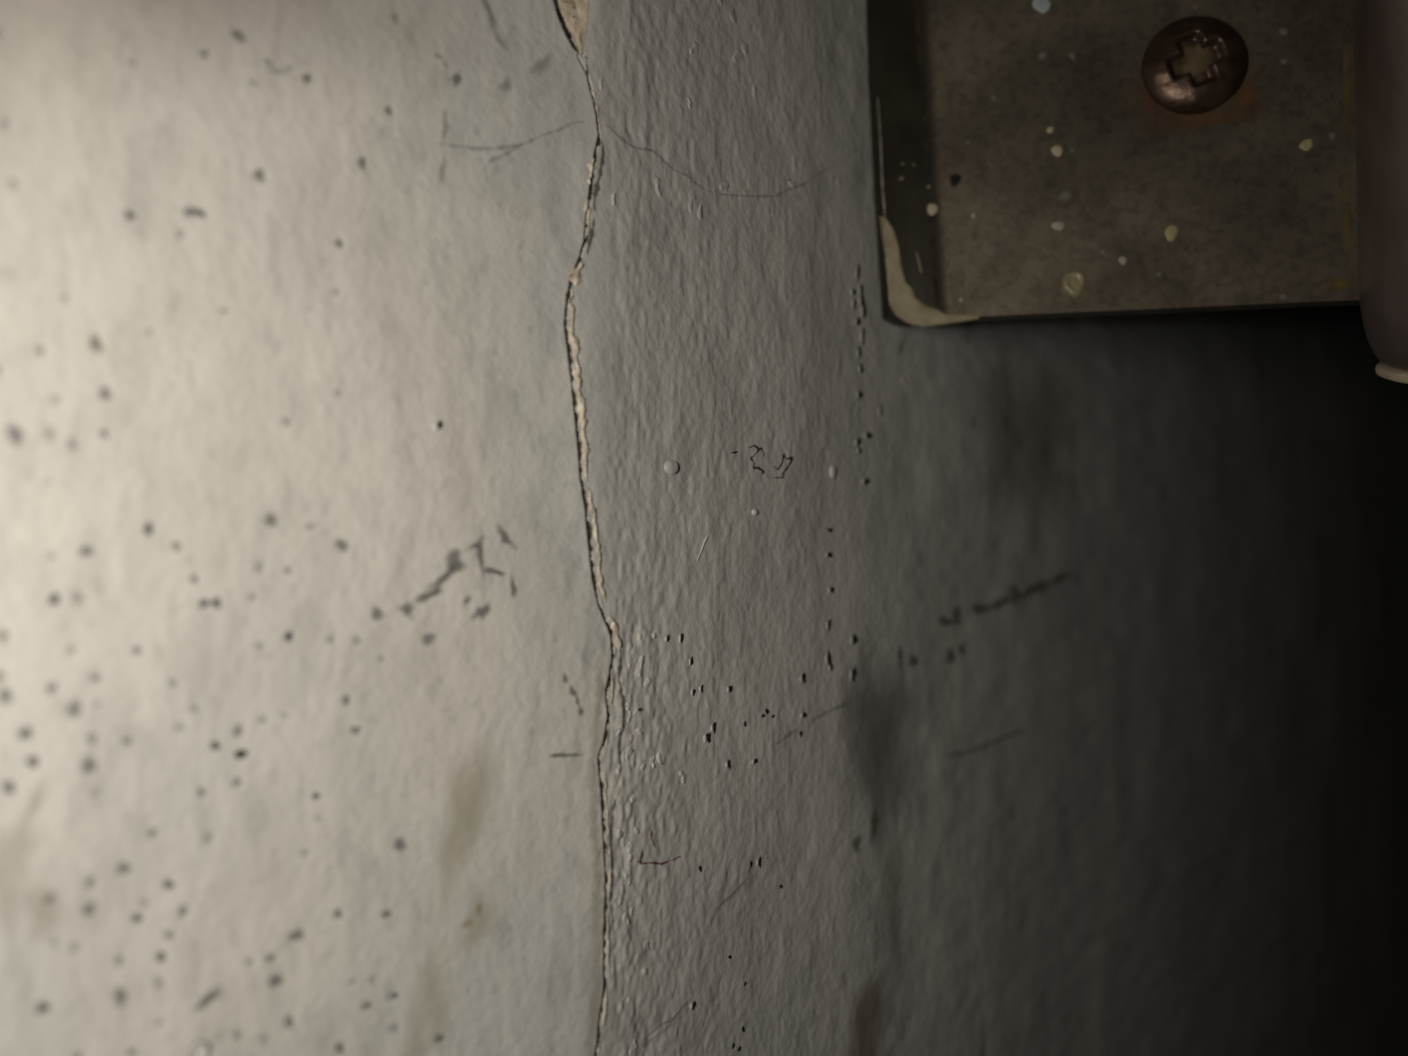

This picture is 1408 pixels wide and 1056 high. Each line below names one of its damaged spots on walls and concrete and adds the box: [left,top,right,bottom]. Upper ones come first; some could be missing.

leakage [401,543,515,613]
crack [564,56,625,1056]